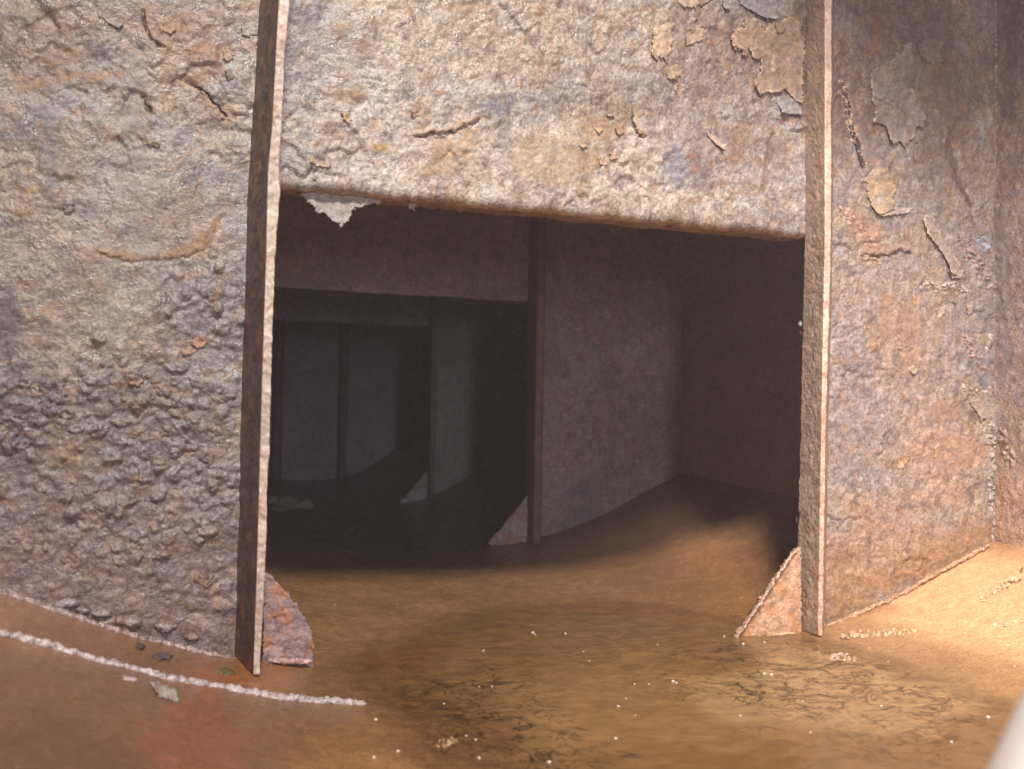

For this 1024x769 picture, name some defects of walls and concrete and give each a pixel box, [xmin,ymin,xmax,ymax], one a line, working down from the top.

peeling [651,22,715,92]
peeling [678,0,806,122]
peeling [300,192,382,228]
peeling [836,42,927,217]
spalling [951,154,972,207]
peeling [923,215,965,318]
corrosion [0,352,237,568]